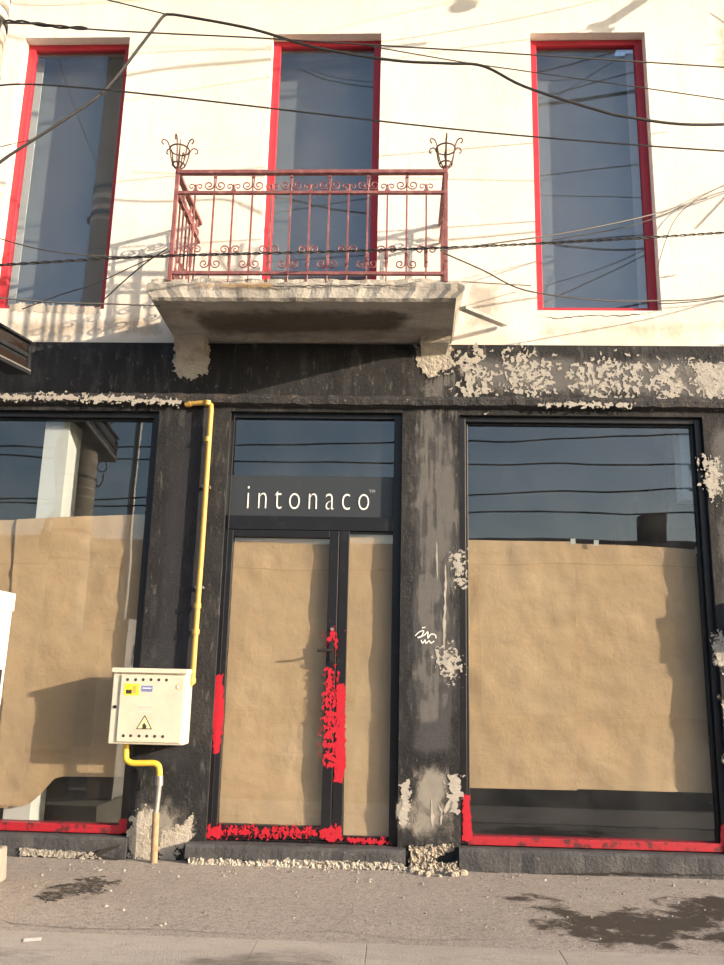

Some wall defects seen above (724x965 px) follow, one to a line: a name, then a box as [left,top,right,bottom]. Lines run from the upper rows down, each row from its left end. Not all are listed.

peeling [0,390,182,408]
peeling [413,342,724,410]
peeling [695,453,724,507]
peeling [431,640,468,688]
peeling [710,629,724,675]
spalling [117,774,473,872]
water stain [506,894,724,950]